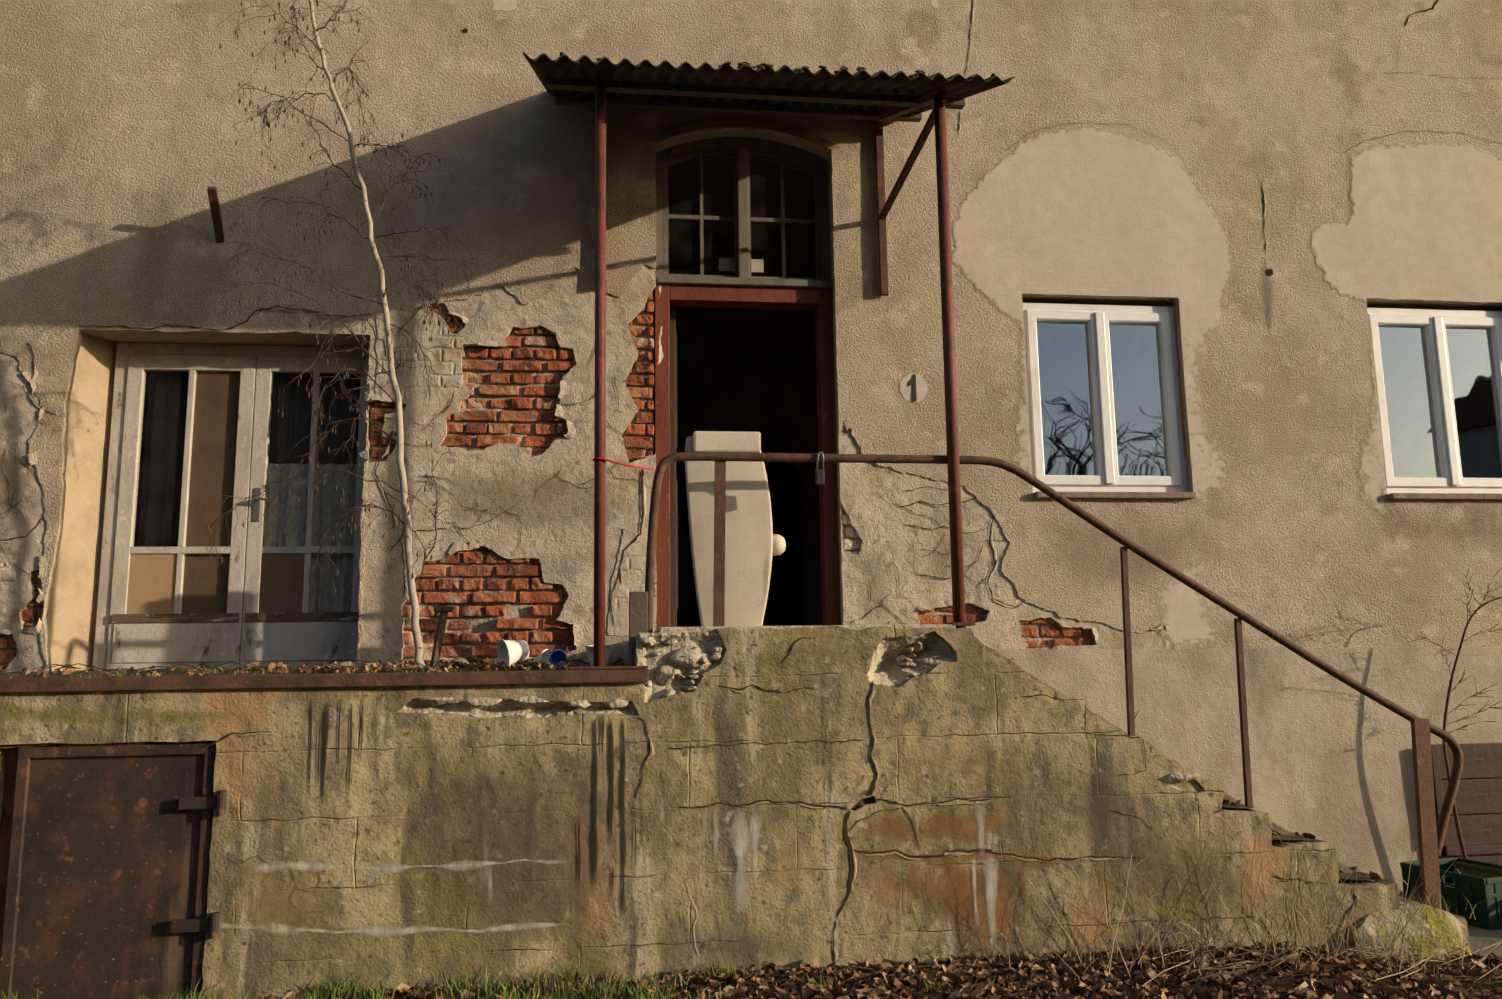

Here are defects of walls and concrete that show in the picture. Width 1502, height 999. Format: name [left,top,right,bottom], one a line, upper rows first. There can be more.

crack [958,0,974,134]
flaking render [0,352,48,672]
flaking render [245,264,726,718]
flaking render [837,419,1174,688]
damp [308,702,377,803]
damp [578,716,637,913]
damp [714,816,759,899]
crack [635,681,1156,963]
corrosion [911,870,1025,938]
damp [973,867,996,936]